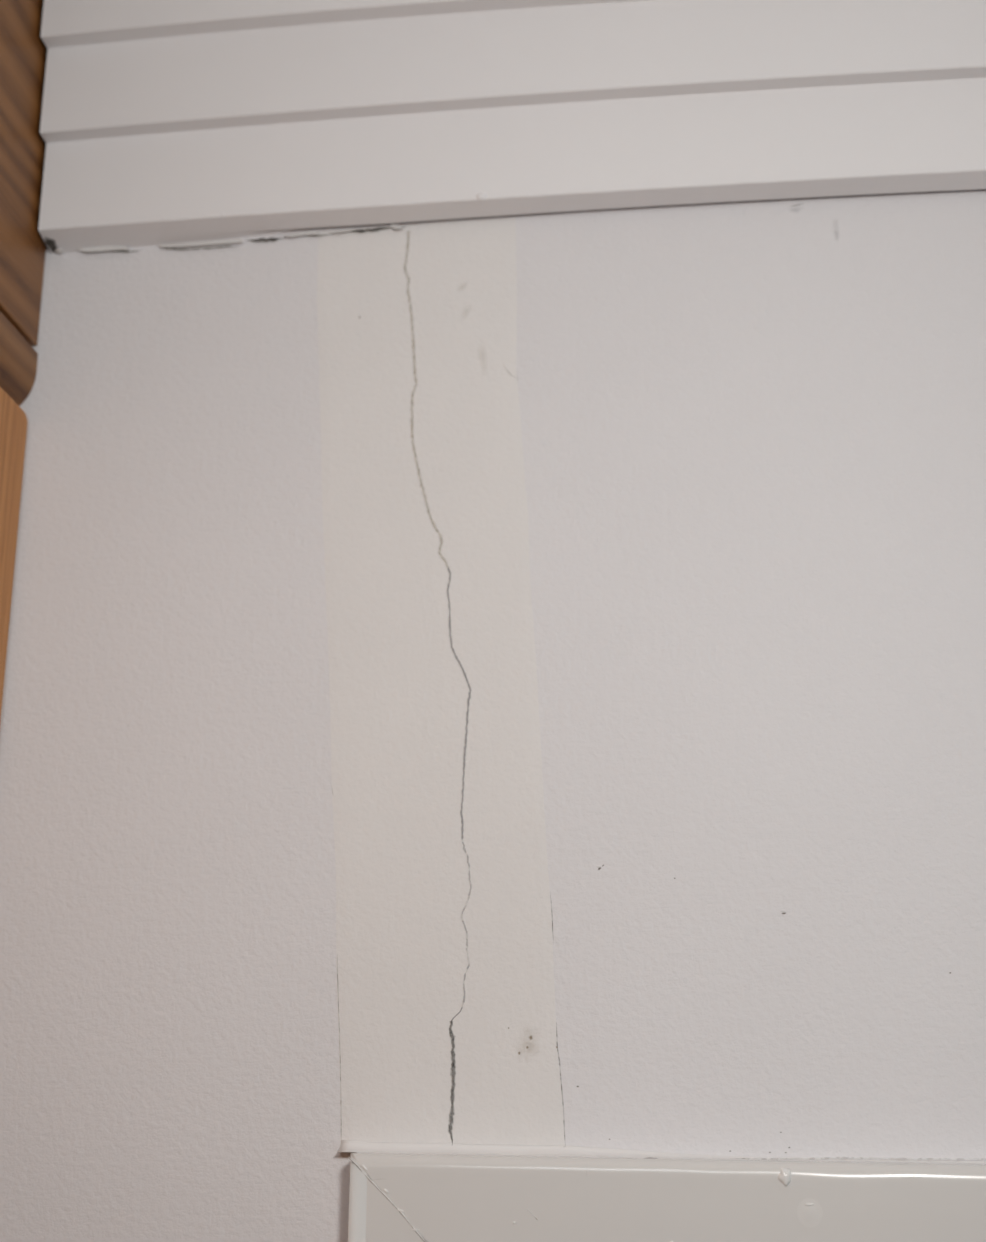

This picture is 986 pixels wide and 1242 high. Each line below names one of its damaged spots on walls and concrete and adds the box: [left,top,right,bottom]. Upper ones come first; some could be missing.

crack [412,435,471,1143]